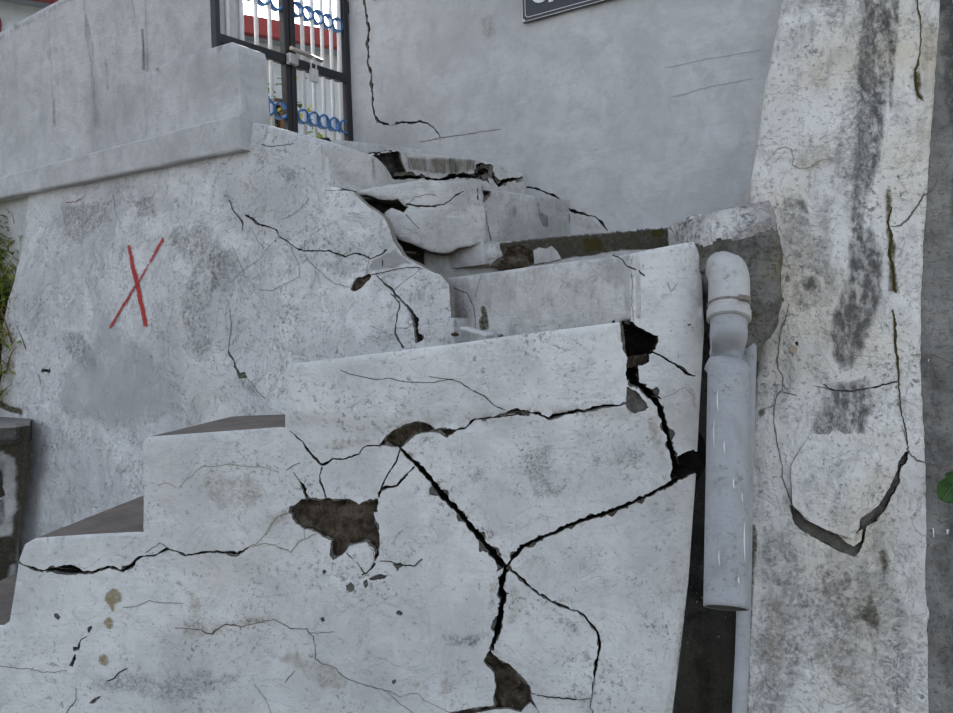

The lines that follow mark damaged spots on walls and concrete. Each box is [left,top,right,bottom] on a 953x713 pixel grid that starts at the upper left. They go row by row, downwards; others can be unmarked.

crack [363,0,500,142]
spalling [368,150,405,179]
crack [392,164,608,231]
water stain [831,0,899,365]
crack [228,190,424,399]
spalling [491,245,562,271]
spalling [612,320,656,413]
water stain [816,384,869,434]
crack [17,434,373,574]
spalling [289,493,402,592]
crack [341,351,695,713]
spalling [450,643,539,713]